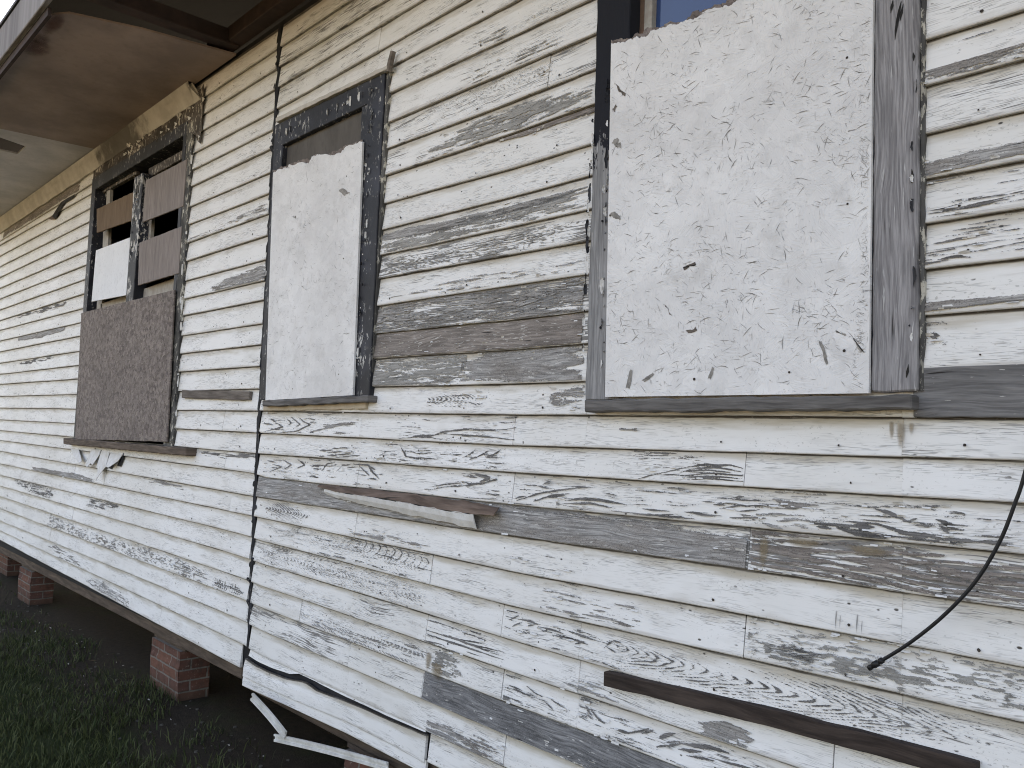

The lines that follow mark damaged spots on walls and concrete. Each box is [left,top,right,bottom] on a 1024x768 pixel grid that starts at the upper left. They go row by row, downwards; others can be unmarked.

peeling [123,97,205,156]
peeling [380,79,626,329]
peeling [372,310,585,410]
peeling [31,448,124,482]
peeling [263,440,1024,550]
peeling [171,563,242,595]
peeling [303,614,759,768]
peeling [505,554,1018,750]